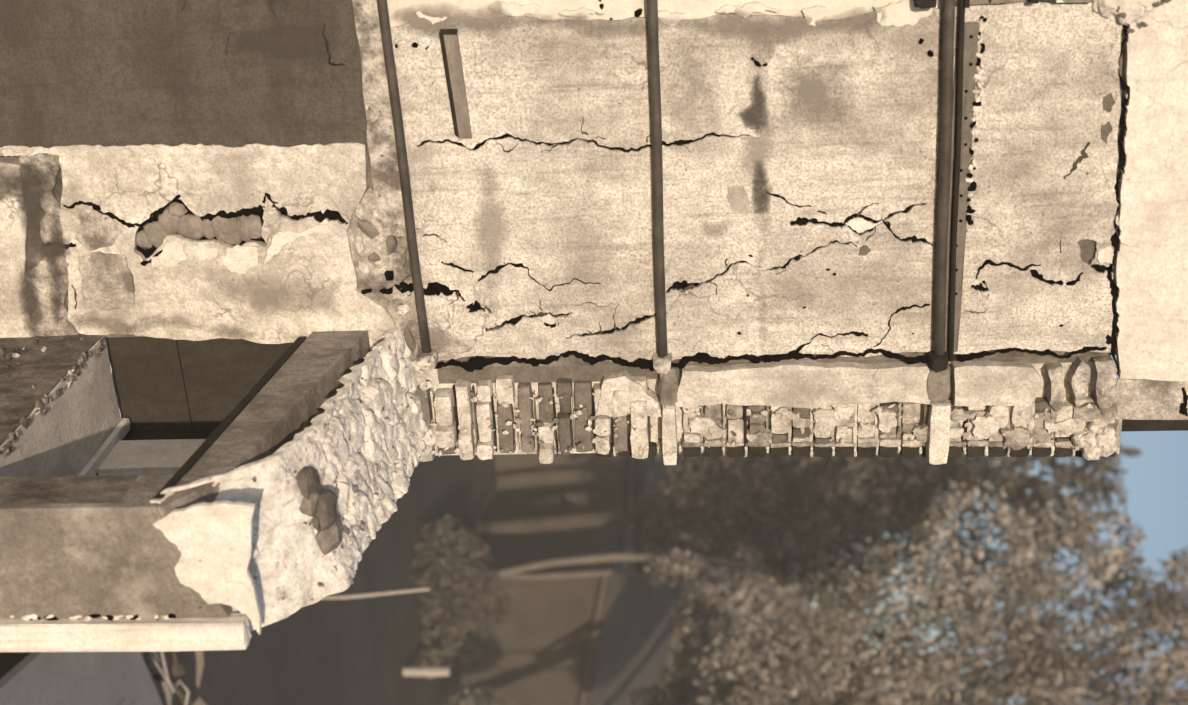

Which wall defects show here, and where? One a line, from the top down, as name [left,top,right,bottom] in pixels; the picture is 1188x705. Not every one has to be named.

damp [401,8,511,36]
damp [696,13,877,62]
damp [793,71,843,122]
crack [418,117,750,153]
damp [740,79,770,212]
crack [140,249,163,266]
crack [63,192,348,228]
flaking render [136,199,337,274]
crack [382,193,936,372]
crack [956,25,1129,374]
flaking render [295,466,343,555]
peeling [153,501,261,635]